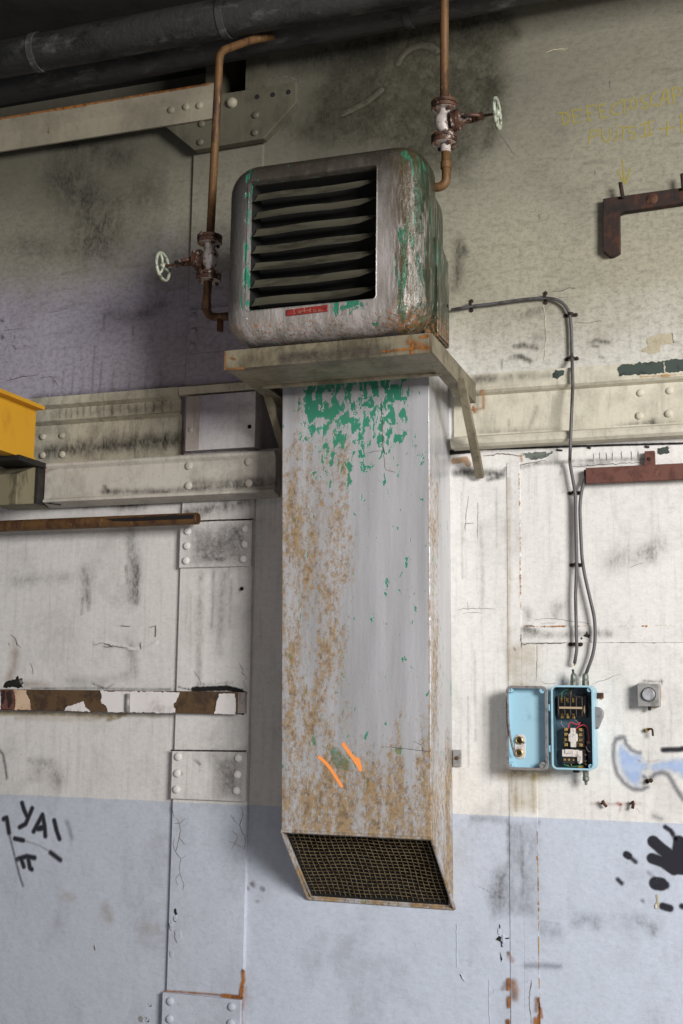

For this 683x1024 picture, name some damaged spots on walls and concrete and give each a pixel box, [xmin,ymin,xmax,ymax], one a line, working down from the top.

peeling [618,333,683,376]
peeling [1,679,22,708]
crack [172,807,185,888]
corrosion [164,970,245,999]
corrosion [507,978,517,1024]